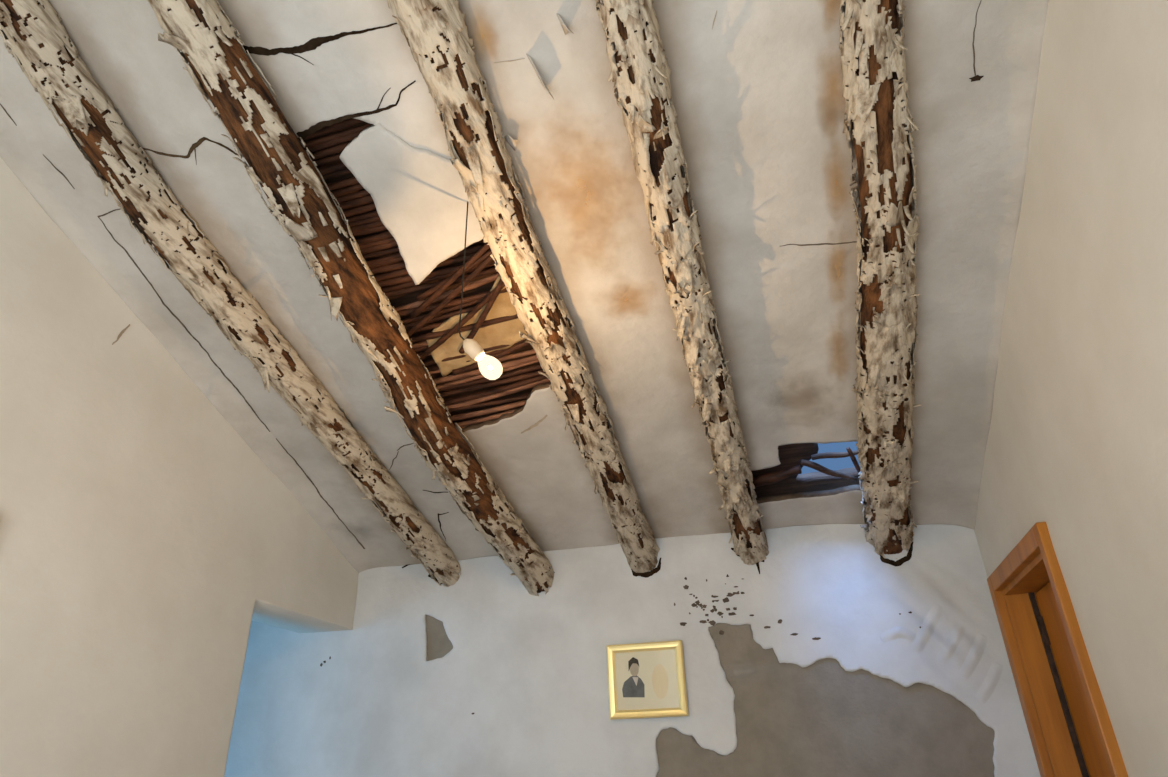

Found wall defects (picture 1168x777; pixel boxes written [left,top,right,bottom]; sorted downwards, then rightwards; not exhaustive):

crack [243,23,397,65]
crack [969,1,984,82]
crack [138,137,239,165]
peeling [595,0,769,565]
crack [98,209,365,549]
spalling [426,615,453,661]
spalling [656,574,995,777]